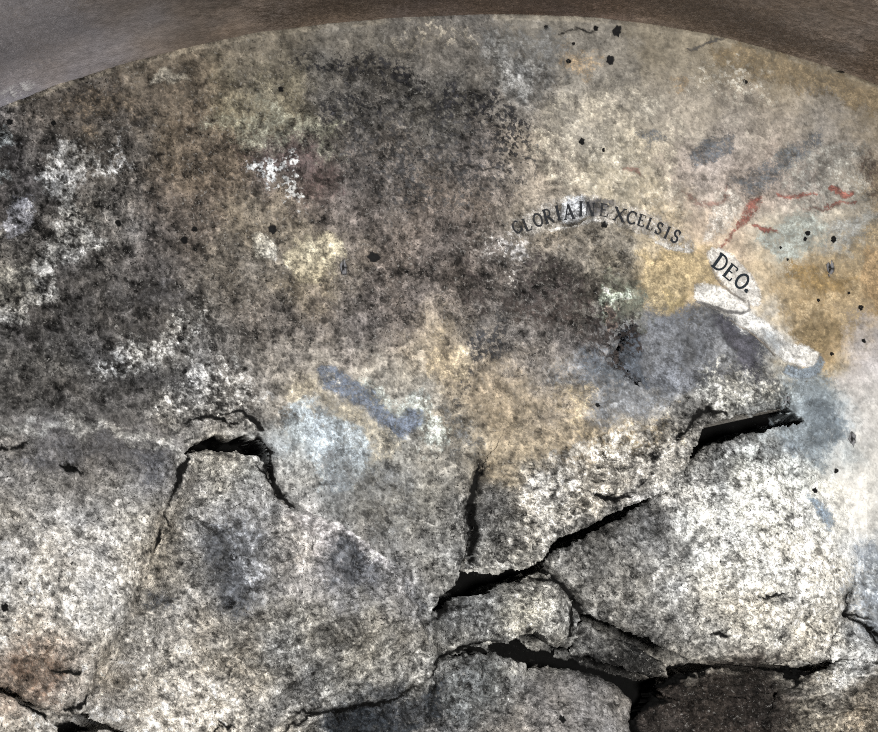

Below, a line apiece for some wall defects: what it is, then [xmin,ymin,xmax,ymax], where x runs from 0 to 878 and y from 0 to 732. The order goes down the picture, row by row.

damp [237,49,546,227]
crack [676,403,776,445]
crack [154,409,299,553]
peeling [531,415,691,541]
peeling [217,520,270,600]
peeling [286,510,390,571]
crack [285,462,713,732]
crack [758,593,787,601]
crack [842,592,878,644]
peeling [848,543,878,614]
crack [0,669,89,732]
crack [753,664,822,689]